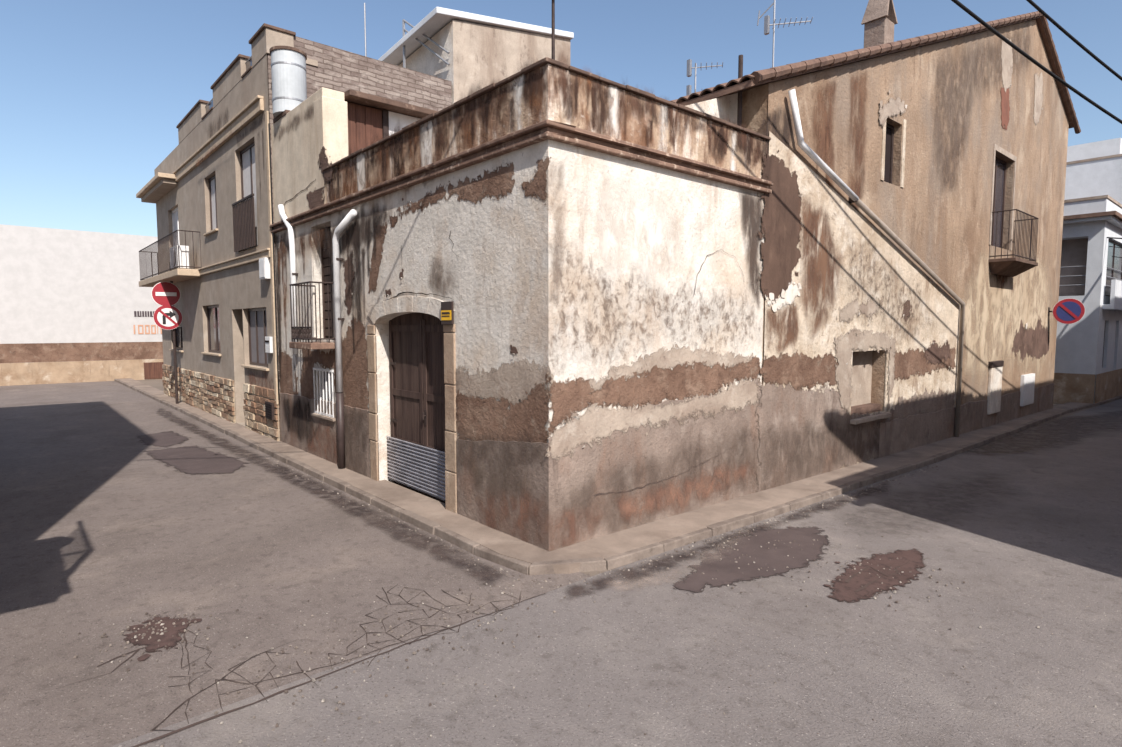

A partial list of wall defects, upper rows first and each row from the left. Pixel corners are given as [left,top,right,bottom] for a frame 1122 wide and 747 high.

damp [337,64,545,177]
damp [851,76,866,210]
damp [937,37,1029,182]
peeling [368,157,551,297]
damp [553,280,644,356]
flaking render [455,298,956,451]
damp [589,79,838,351]
damp [852,252,920,331]
peeling [1012,318,1050,361]